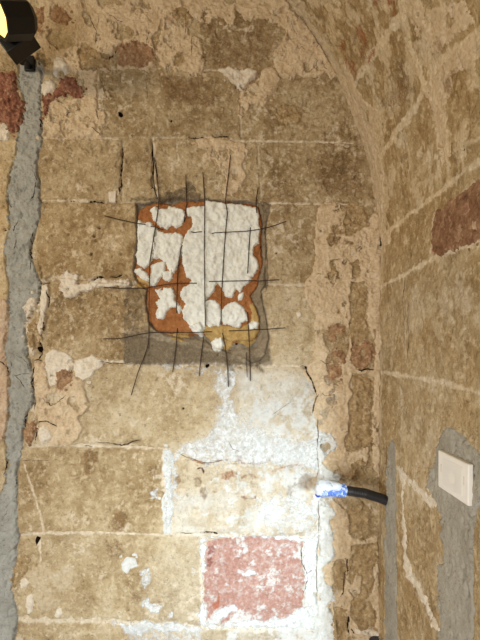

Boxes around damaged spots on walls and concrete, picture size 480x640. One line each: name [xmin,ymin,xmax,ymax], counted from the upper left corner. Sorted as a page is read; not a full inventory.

spalling [0,69,28,142]
crack [117,148,125,194]
crack [150,144,158,199]
peeling [21,0,385,486]
water stain [124,318,320,519]
crack [302,360,332,475]
water stain [199,535,227,576]
water stain [253,535,317,590]
crack [301,502,320,601]
water stain [142,598,162,613]
water stain [113,603,315,640]